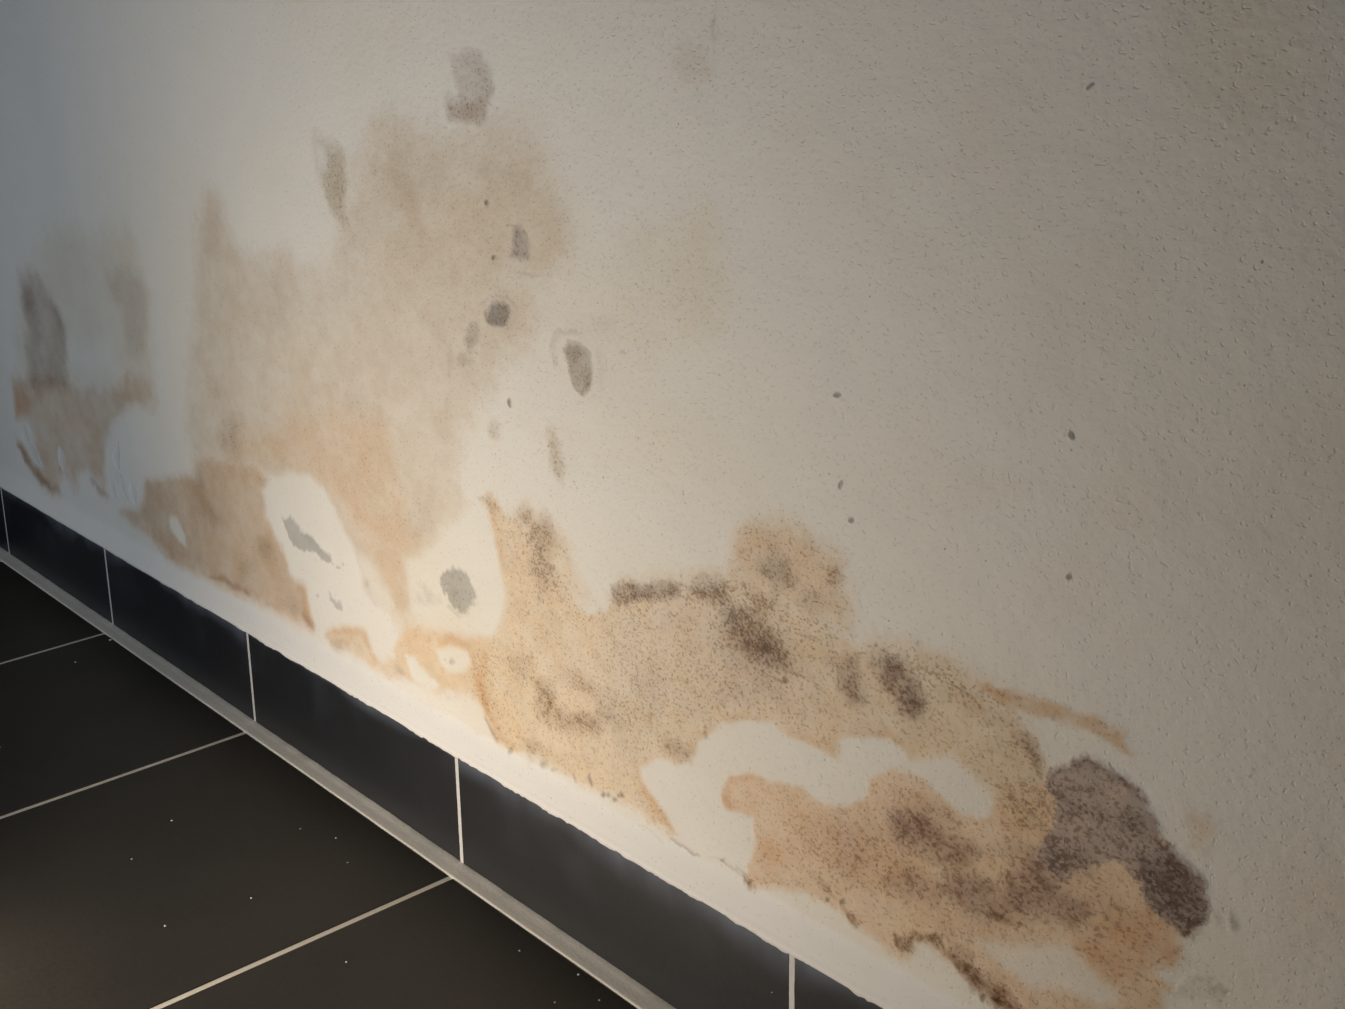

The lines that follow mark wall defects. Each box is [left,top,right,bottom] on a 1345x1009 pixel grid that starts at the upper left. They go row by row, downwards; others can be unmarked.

water stain [6,194,165,509]
water stain [116,42,610,713]
water stain [588,171,748,393]
peeling [281,512,346,571]
peeling [413,563,483,623]
water stain [472,487,1241,1009]